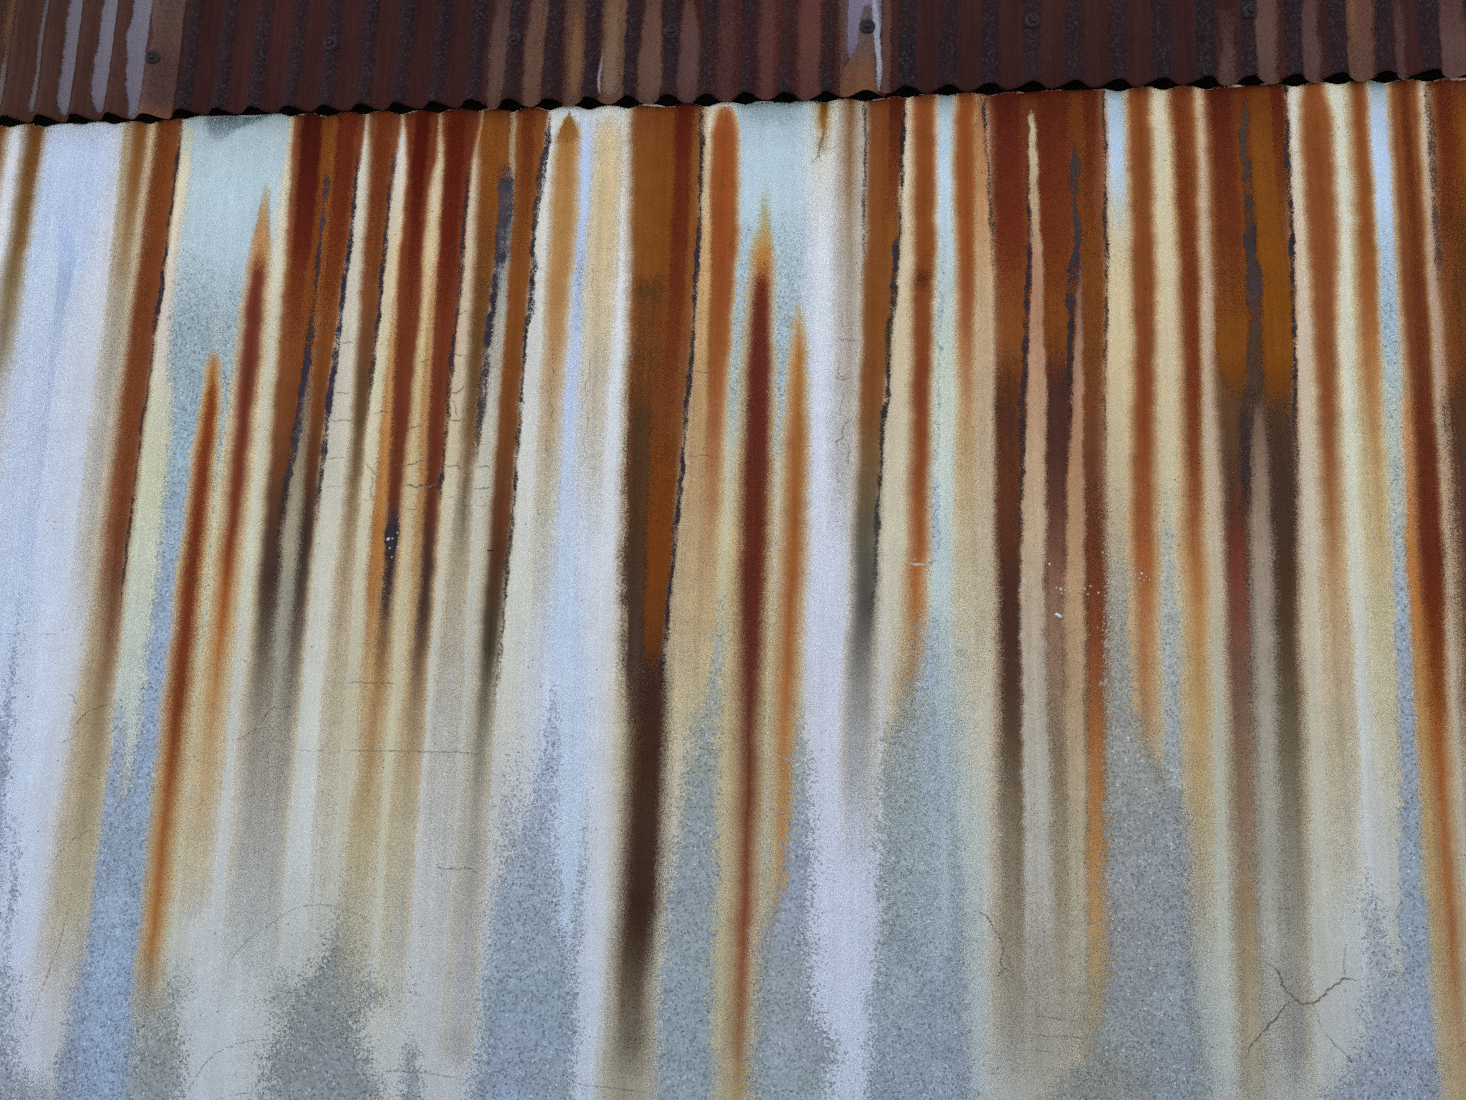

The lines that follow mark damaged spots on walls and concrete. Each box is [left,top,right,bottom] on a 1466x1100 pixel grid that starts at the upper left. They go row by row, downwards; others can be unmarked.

rust [28,0,186,1008]
rust [127,0,1121,1100]
rust [1121,0,1466,1100]
crack [1246,944,1357,1069]